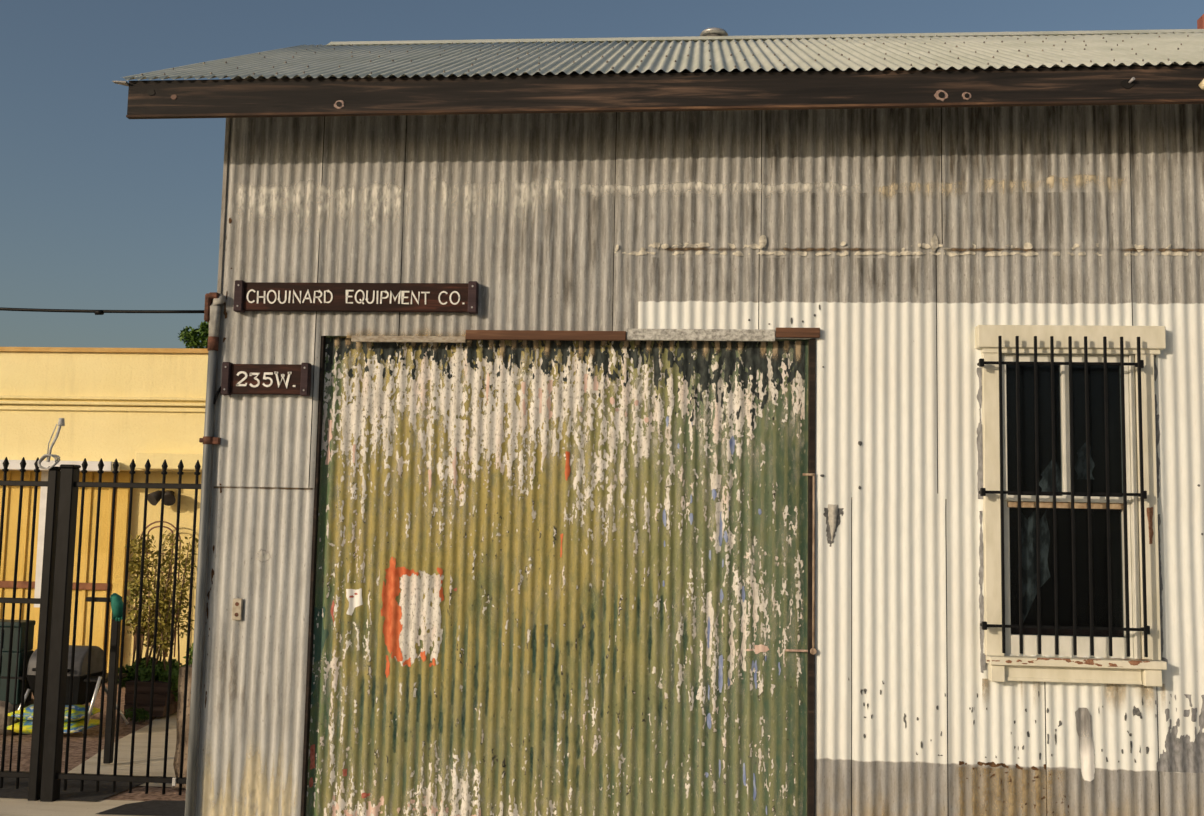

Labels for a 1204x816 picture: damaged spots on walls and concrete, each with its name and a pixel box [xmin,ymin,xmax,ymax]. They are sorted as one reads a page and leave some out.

leakage [862,107,1050,196]
leakage [1046,105,1134,189]
leakage [235,181,408,232]
leakage [431,179,859,220]
peeling [307,338,805,816]
peeling [1101,694,1204,773]
corrosion [959,761,1069,816]